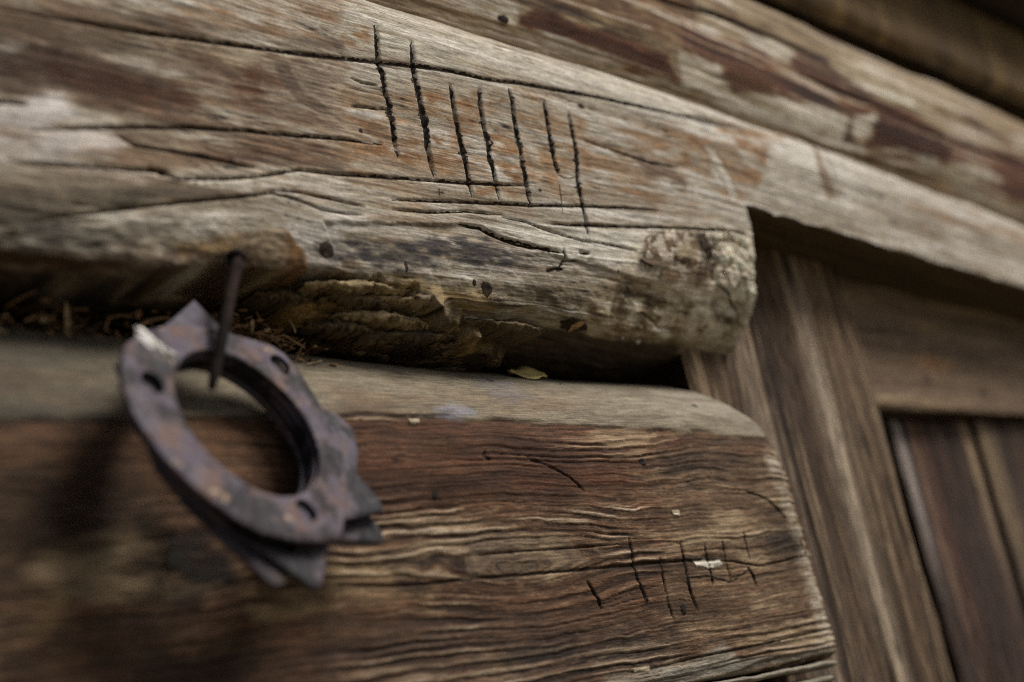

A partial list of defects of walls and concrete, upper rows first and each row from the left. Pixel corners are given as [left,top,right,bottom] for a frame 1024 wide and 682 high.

crack [7,126,744,273]
crack [527,457,584,491]